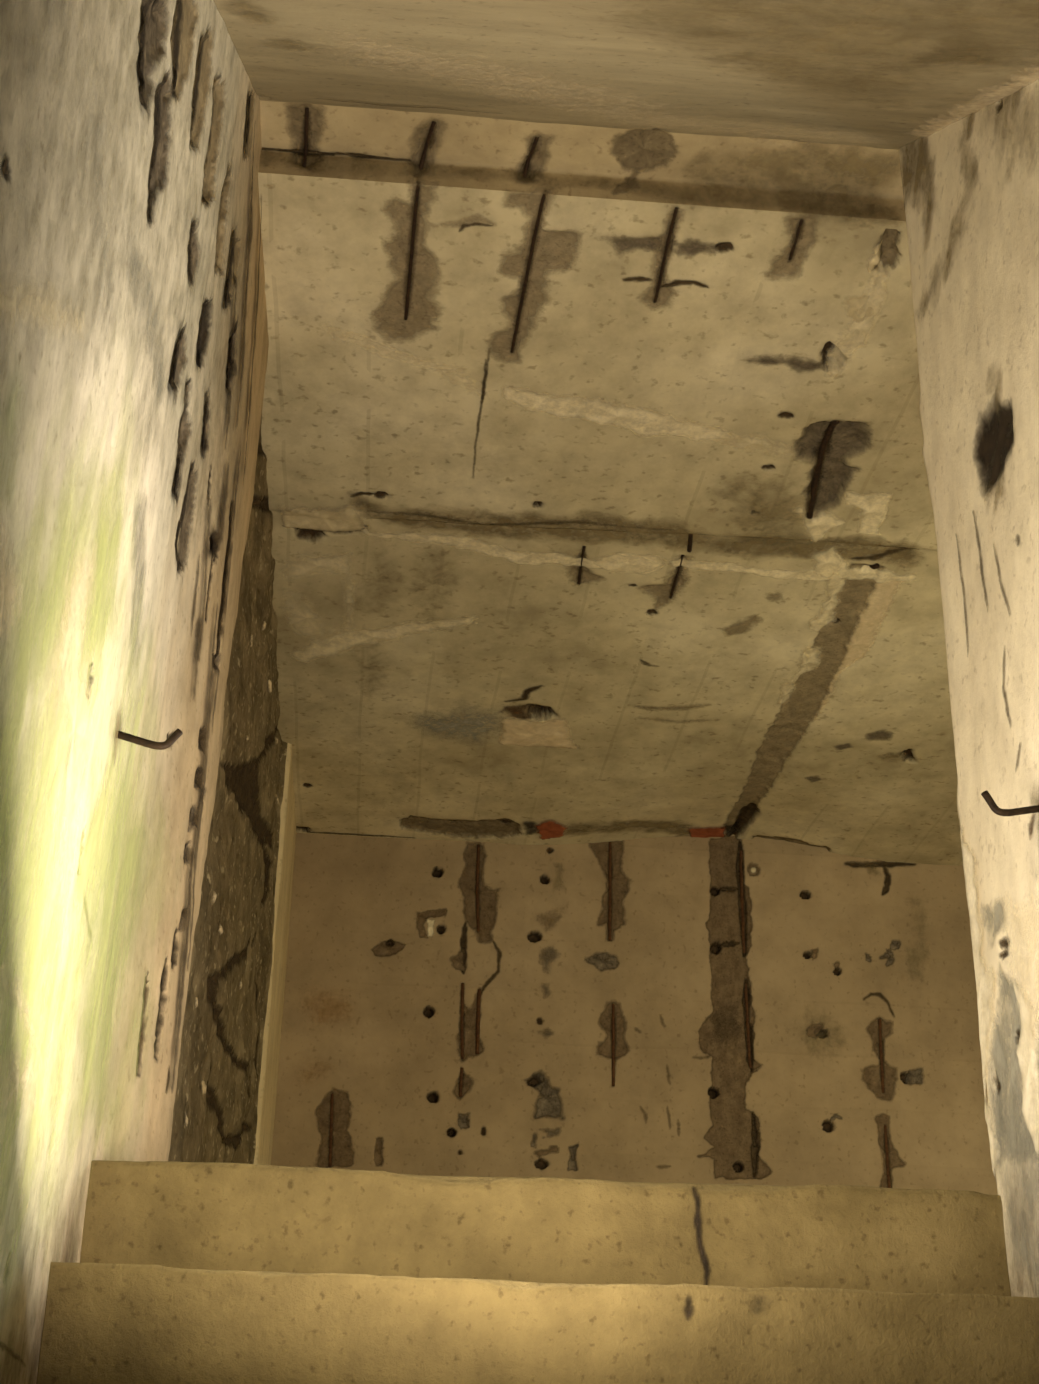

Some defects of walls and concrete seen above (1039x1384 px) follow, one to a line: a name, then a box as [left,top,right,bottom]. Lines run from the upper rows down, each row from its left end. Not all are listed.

flaking render [137,0,254,573]
spalling [372,121,441,339]
spalling [490,135,580,362]
spalling [623,207,734,308]
crack [136,127,410,1149]
flaking render [372,815,567,957]
flaking render [585,840,629,971]
flaking render [679,420,885,1180]
flaking render [316,1088,354,1168]
flaking render [863,1017,923,1188]
peeling [985,903,1039,1159]
crack [685,1187,709,1319]